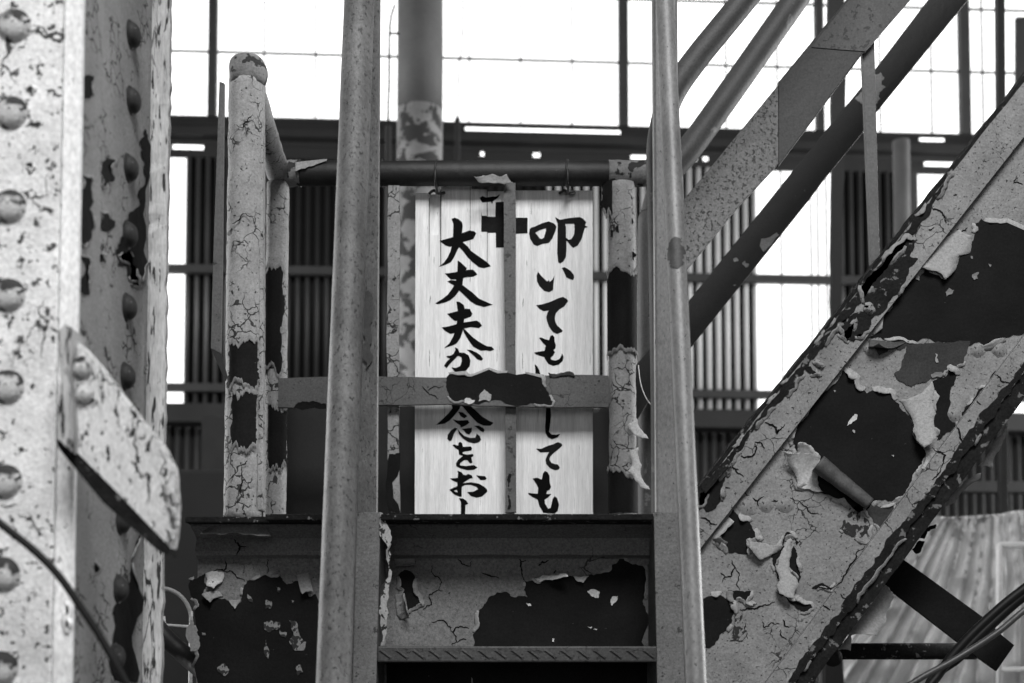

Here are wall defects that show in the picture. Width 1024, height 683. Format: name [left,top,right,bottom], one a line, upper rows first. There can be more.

peeling [80,129,151,296]
peeling [226,262,327,474]
peeling [446,367,575,407]
peeling [783,218,1024,545]
crack [725,422,818,514]
peeling [188,571,319,683]
crack [424,567,468,644]
crack [458,559,556,580]
peeling [472,558,648,646]
crack [721,561,789,639]
peeling [699,458,837,615]
crack [816,546,865,610]